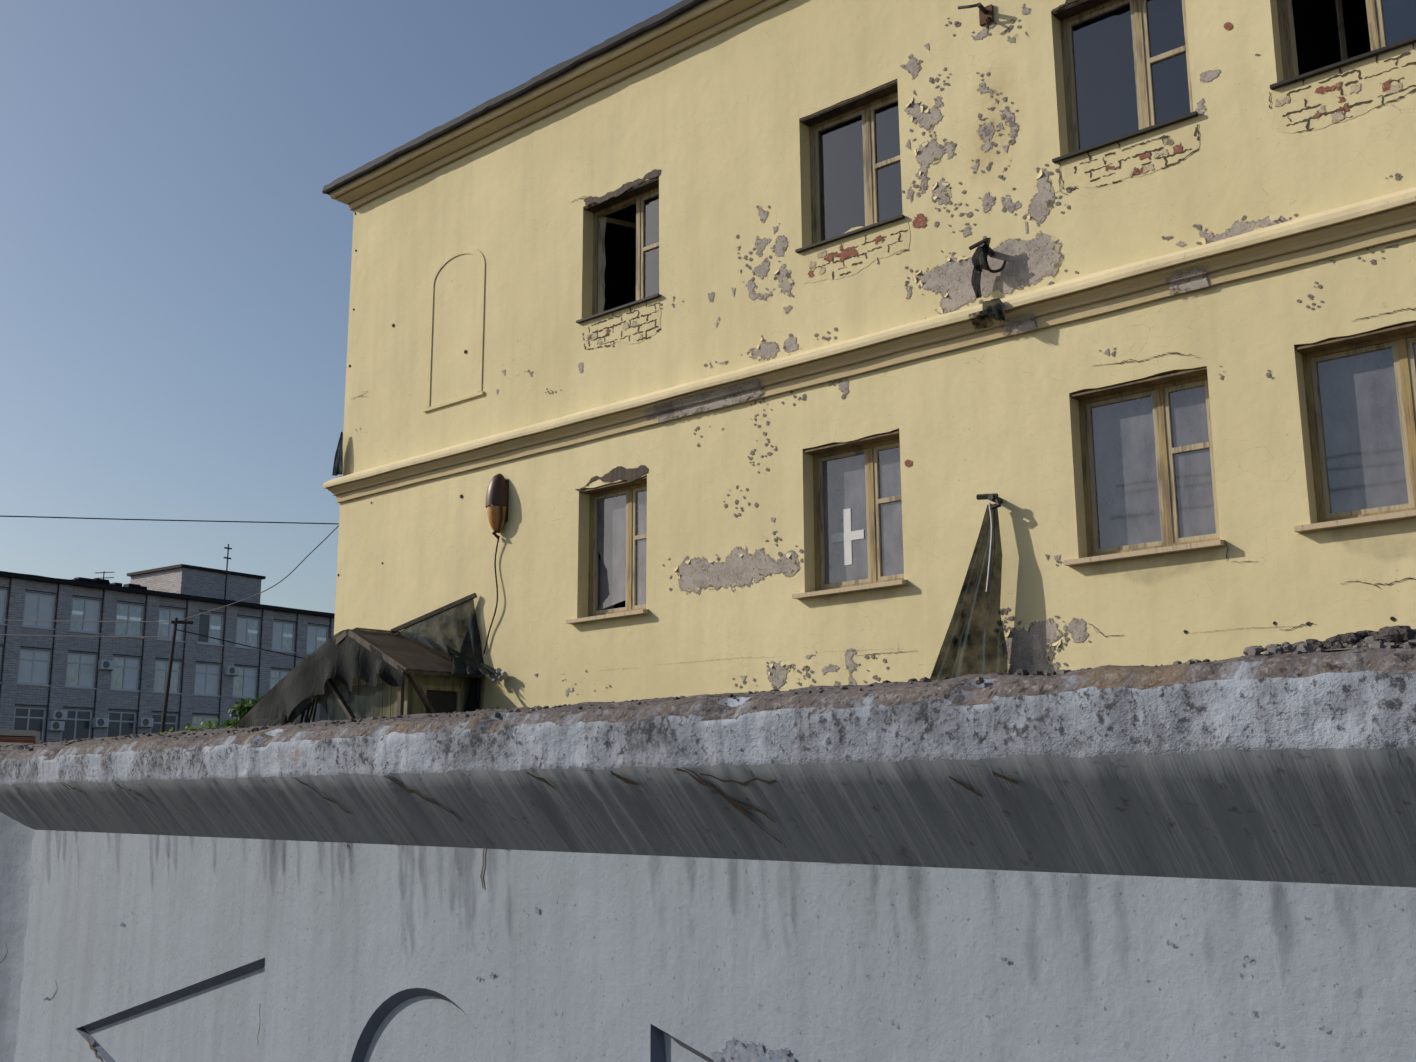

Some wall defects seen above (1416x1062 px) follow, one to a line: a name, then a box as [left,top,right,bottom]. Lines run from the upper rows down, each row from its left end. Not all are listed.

peeling [945,4,1031,43]
spalling [1269,43,1416,133]
peeling [731,43,1221,319]
spalling [578,296,684,373]
peeling [704,333,802,368]
crack [1354,308,1416,321]
peeling [644,378,806,473]
peeling [662,517,803,595]
crack [1340,577,1416,588]
peeling [732,648,889,693]
peeling [1000,607,1091,675]
crack [1190,623,1317,634]